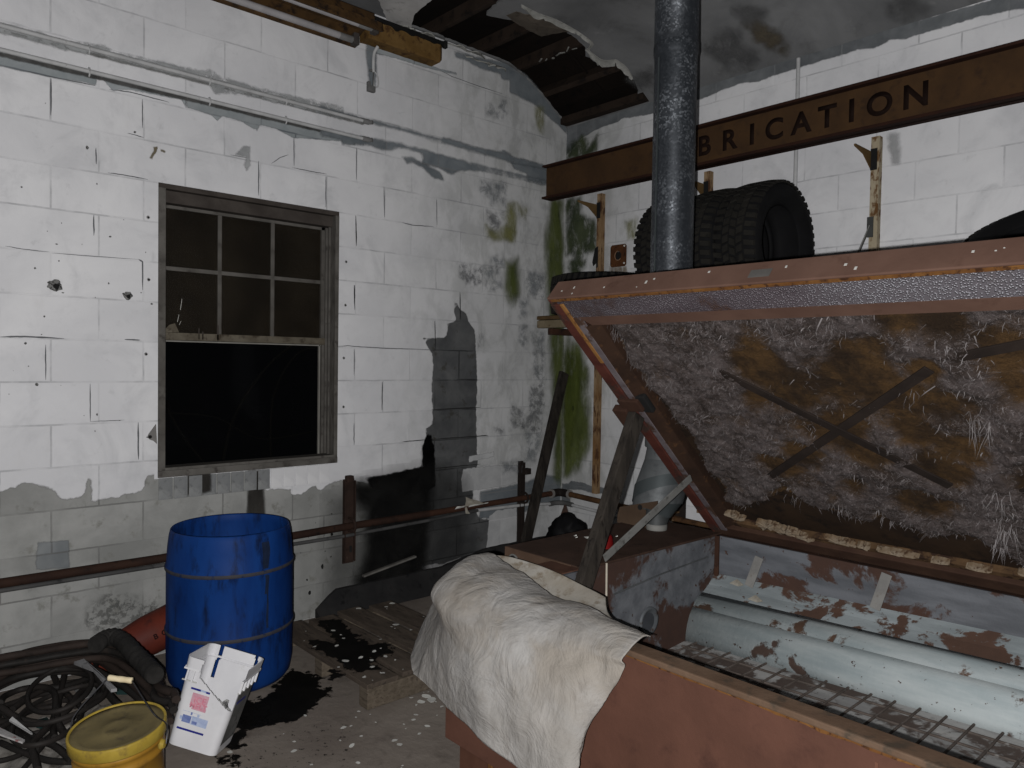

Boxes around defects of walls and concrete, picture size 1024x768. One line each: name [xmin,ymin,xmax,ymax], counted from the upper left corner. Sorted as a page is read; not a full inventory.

peeling [0,52,547,200]
peeling [366,45,456,85]
peeling [448,43,654,155]
peeling [521,4,633,80]
peeling [697,0,1024,100]
spalling [47,279,64,293]
damp [488,226,513,240]
damp [506,260,519,299]
damp [570,258,585,273]
peeling [0,471,248,654]
peeling [263,480,368,622]
peeling [0,675,68,691]